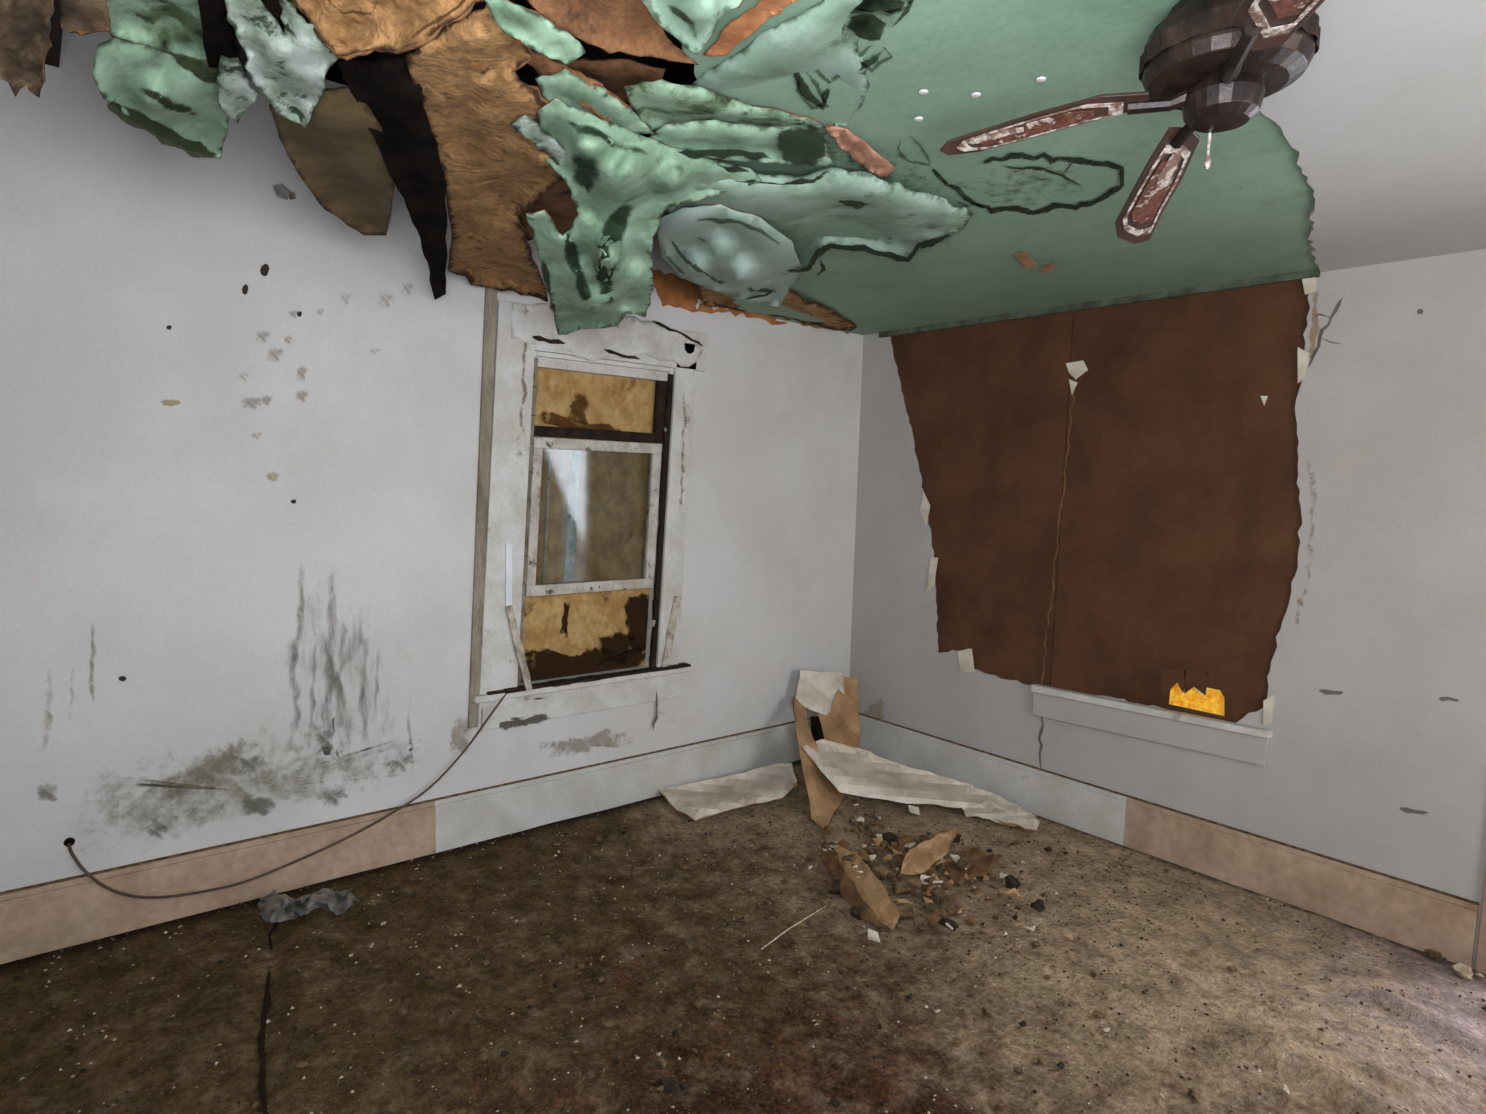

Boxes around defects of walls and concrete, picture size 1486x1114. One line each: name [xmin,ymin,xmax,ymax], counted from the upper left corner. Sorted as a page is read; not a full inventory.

peeling [92,0,230,159]
peeling [272,183,296,200]
peeling [485,0,1318,725]
leakage [172,747,305,815]